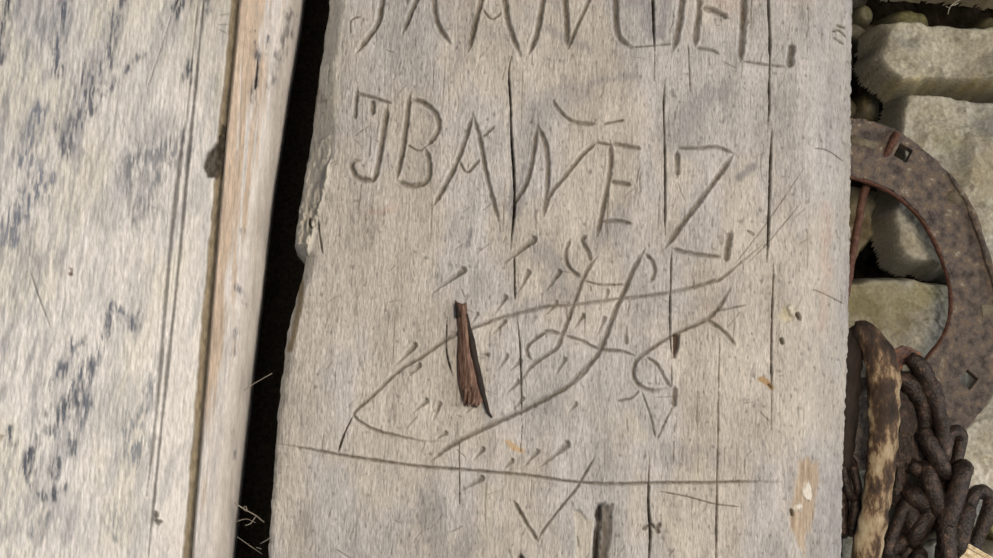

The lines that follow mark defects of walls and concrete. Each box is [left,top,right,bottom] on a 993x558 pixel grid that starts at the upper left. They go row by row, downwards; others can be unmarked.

crack [765,0,775,433]
peeling [786,454,824,558]